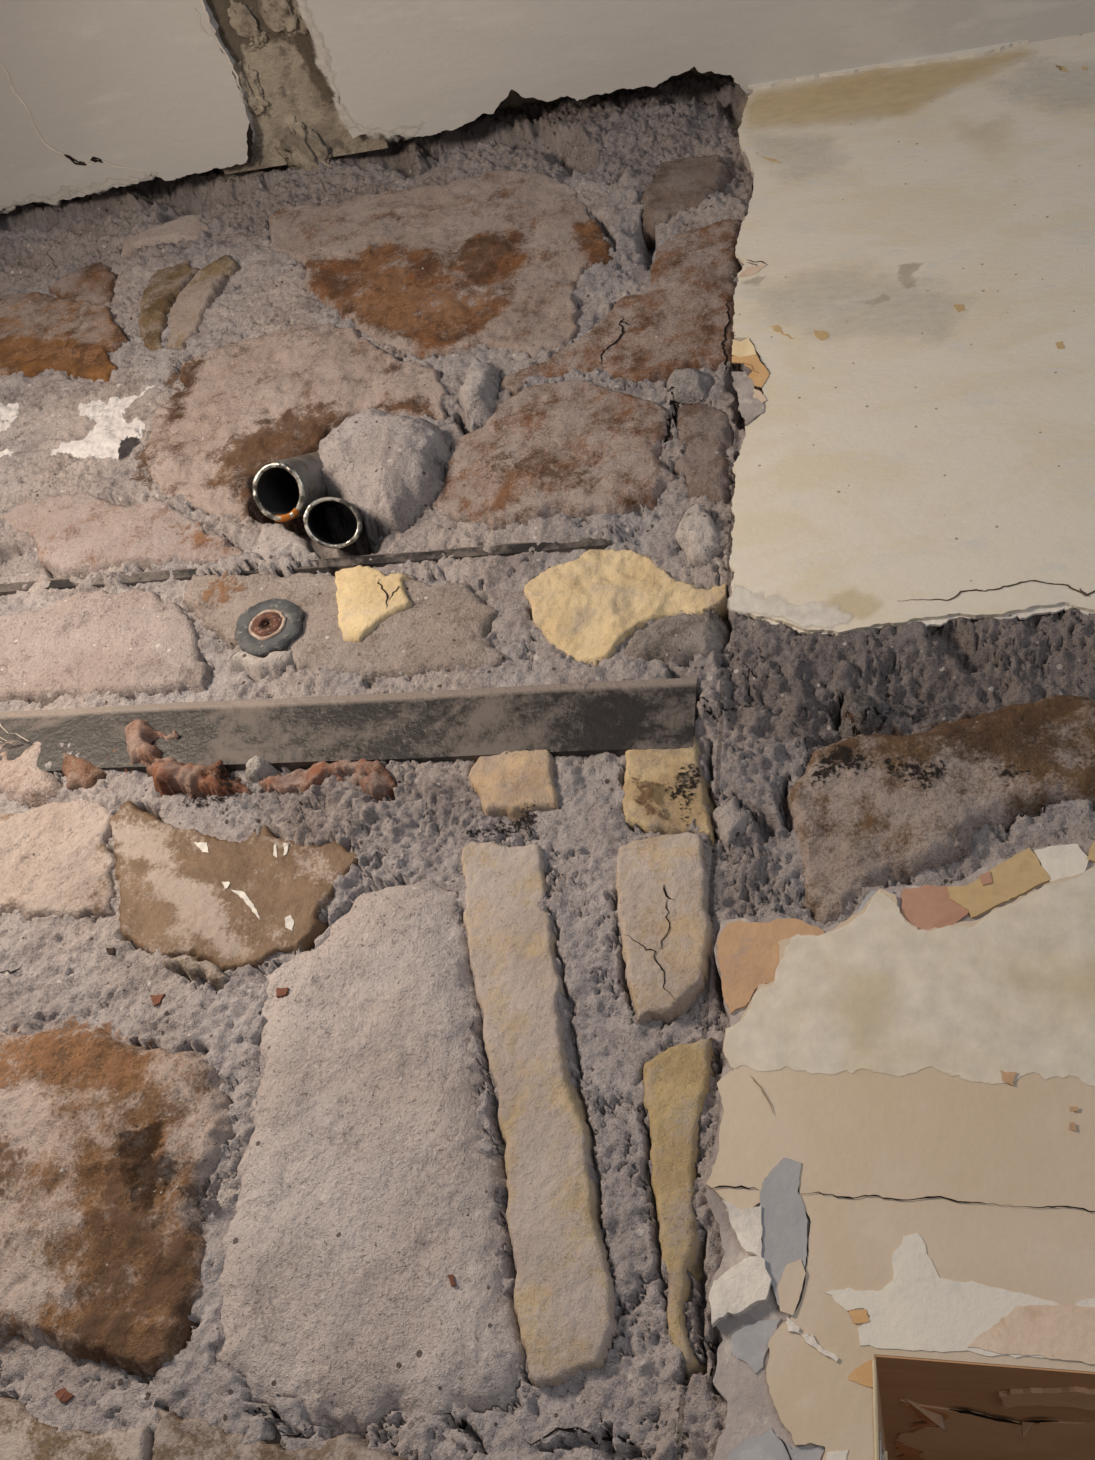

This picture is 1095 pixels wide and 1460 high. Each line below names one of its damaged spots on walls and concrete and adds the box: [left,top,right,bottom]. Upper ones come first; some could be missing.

flaking render [0,61,769,809]
crack [906,580,1095,601]
flaking render [0,607,1095,1460]
crack [714,1183,758,1191]
crack [801,1192,1095,1212]